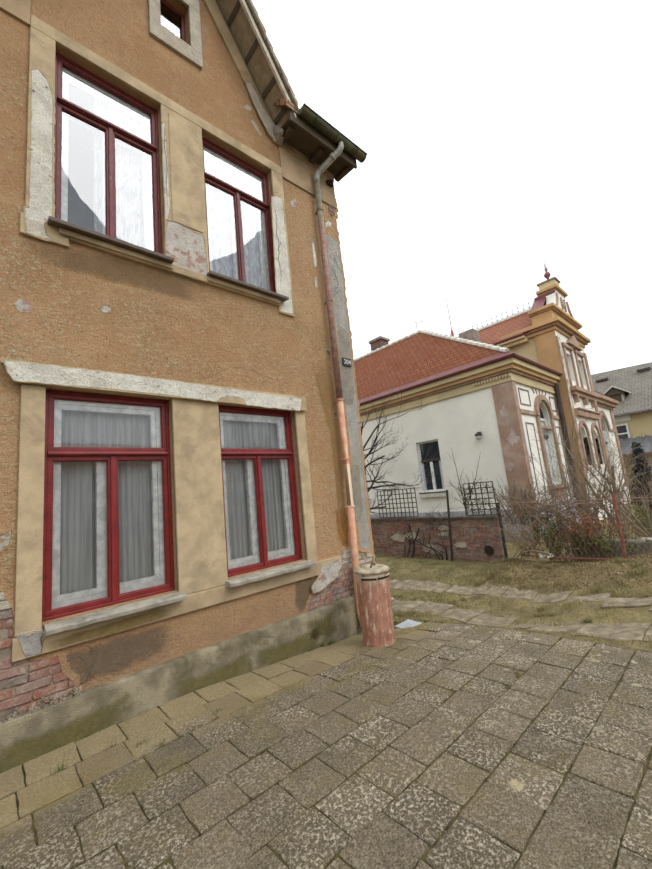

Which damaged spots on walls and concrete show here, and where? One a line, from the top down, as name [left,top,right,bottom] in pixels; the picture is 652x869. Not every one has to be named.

flaking render [161,121,209,280]
flaking render [3,359,302,411]
flaking render [302,198,375,613]
flaking render [0,524,17,557]
flaking render [0,570,84,720]